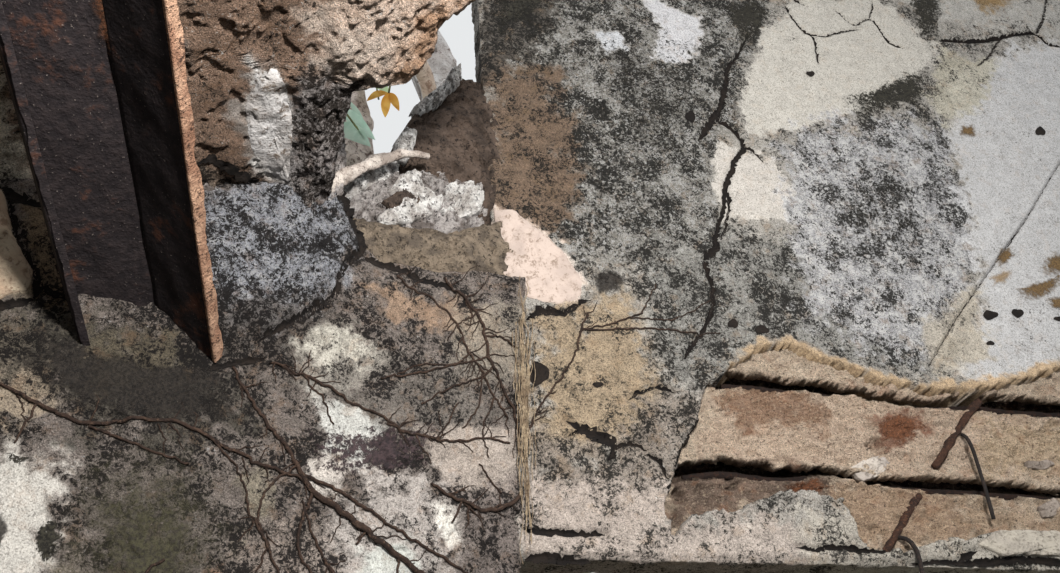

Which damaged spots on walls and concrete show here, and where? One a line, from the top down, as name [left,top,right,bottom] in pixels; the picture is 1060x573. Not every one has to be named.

crack [785,0,903,64]
crack [939,0,1060,66]
crack [682,38,768,360]
crack [930,164,1060,363]
crack [566,409,700,493]
crack [630,385,674,400]
spalling [664,349,1060,558]
corrosion [880,414,926,443]